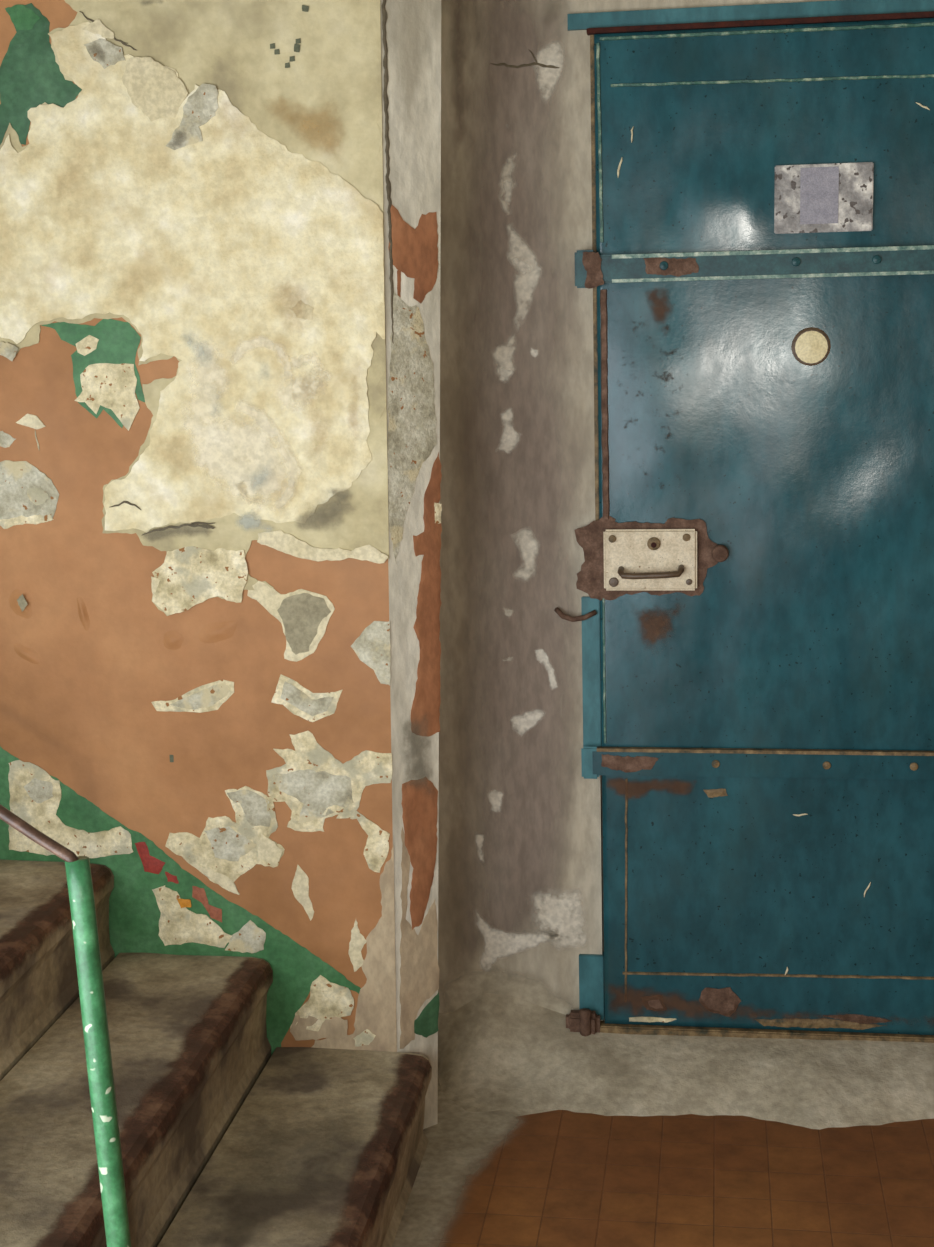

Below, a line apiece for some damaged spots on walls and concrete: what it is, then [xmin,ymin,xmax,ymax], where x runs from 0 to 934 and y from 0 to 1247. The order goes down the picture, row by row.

flaking render [0,0,442,737]
corrosion [599,518,718,600]
corrosion [639,611,675,643]
peeling [8,674,440,1052]
corrosion [612,987,767,1018]
corrosion [823,1014,892,1024]